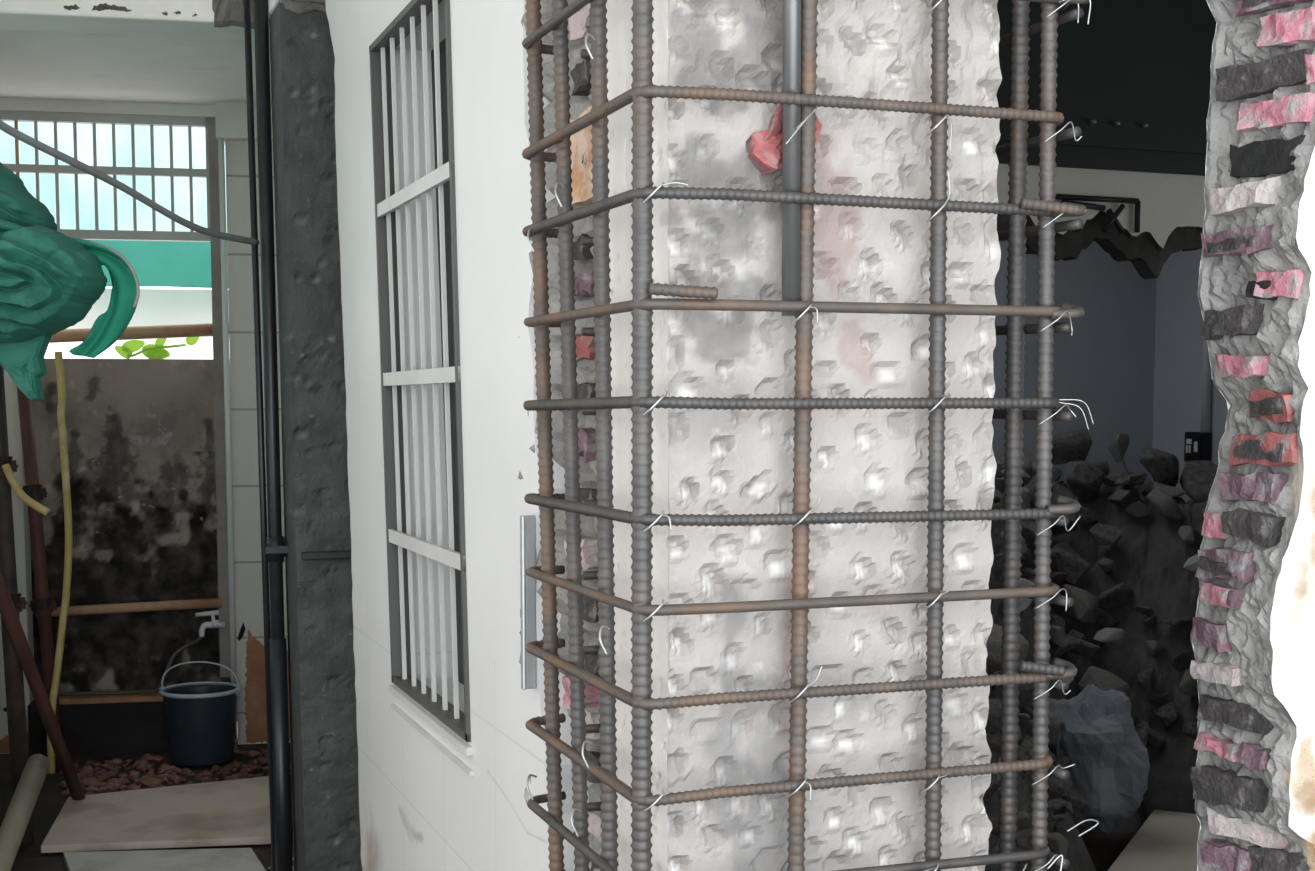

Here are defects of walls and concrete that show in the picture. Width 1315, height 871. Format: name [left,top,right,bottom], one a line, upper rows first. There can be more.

peeling [63,3,131,12]
spalling [212,0,254,29]
spalling [997,163,1010,241]
spalling [1025,0,1315,871]
water stain [31,479,220,692]